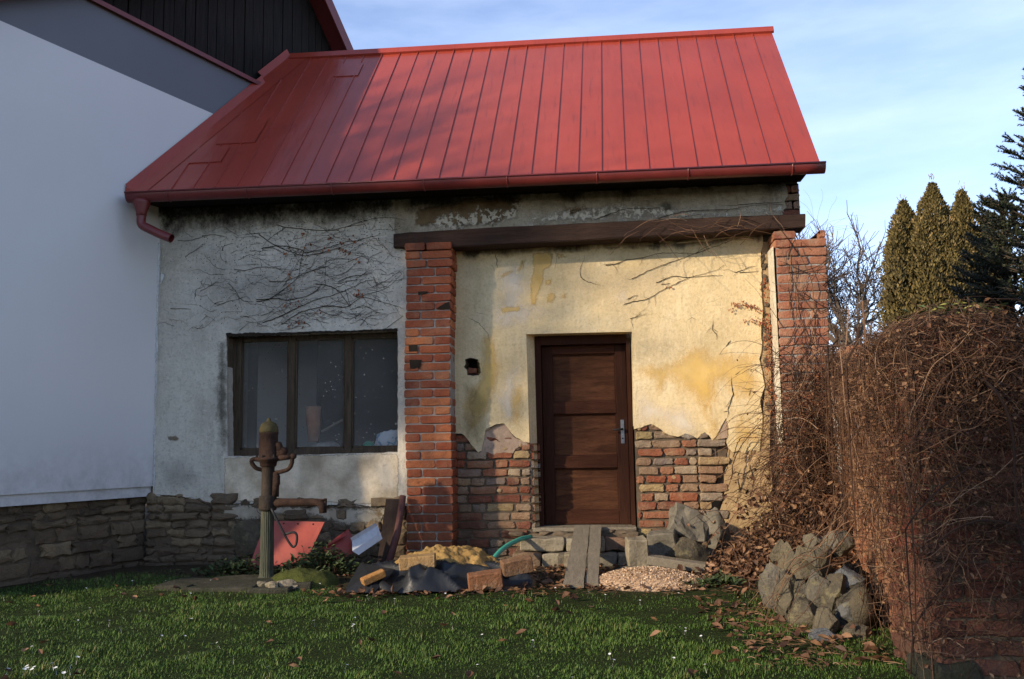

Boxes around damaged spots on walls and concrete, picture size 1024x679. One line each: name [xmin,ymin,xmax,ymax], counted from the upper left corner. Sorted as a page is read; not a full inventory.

peeling [416,196,782,230]
flaking render [634,242,775,559]
flaking render [456,423,541,559]